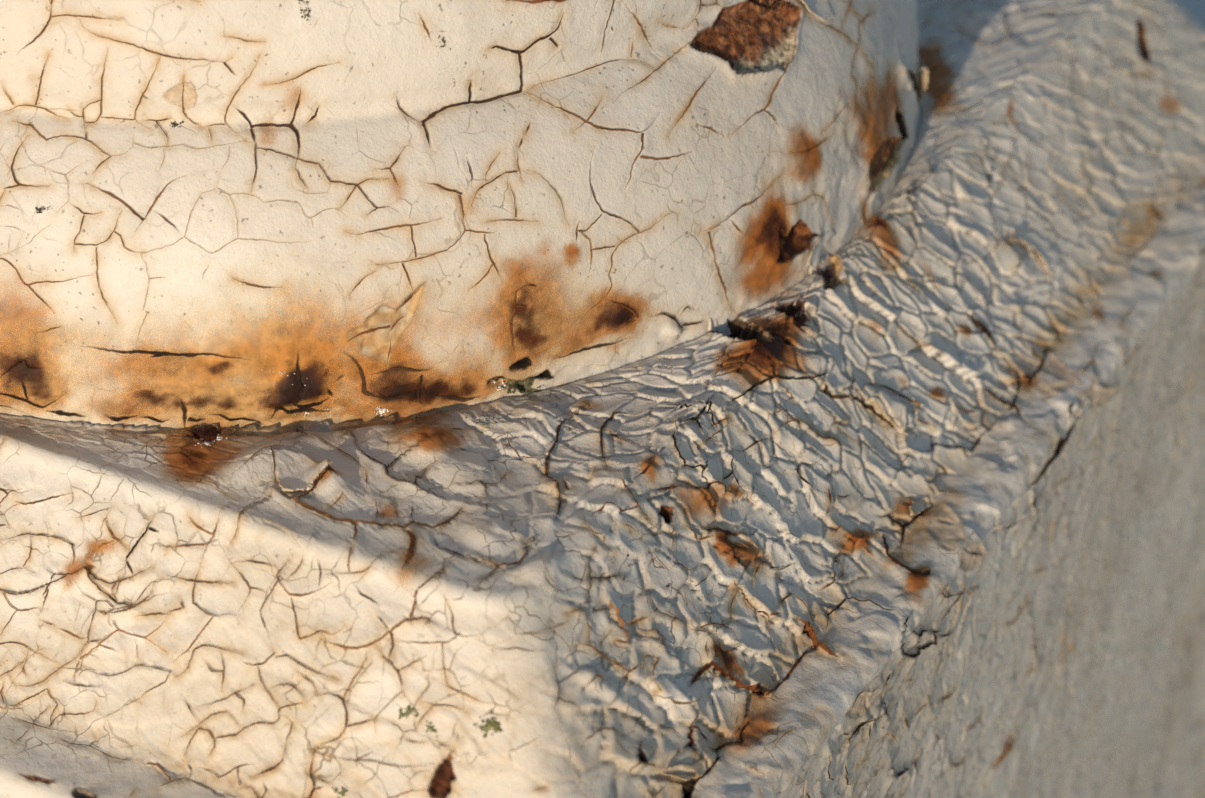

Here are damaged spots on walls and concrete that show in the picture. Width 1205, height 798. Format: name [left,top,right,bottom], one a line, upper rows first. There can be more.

peeling [691,0,834,74]
rust [565,245,579,264]
rust [740,196,792,296]
crack [701,0,880,316]
rust [854,73,900,164]
crack [895,119,1198,309]
rust [0,297,66,410]
rust [97,261,647,481]
rust [716,315,805,386]
crack [1001,301,1140,539]
crack [502,314,1064,798]
peeling [428,754,456,798]